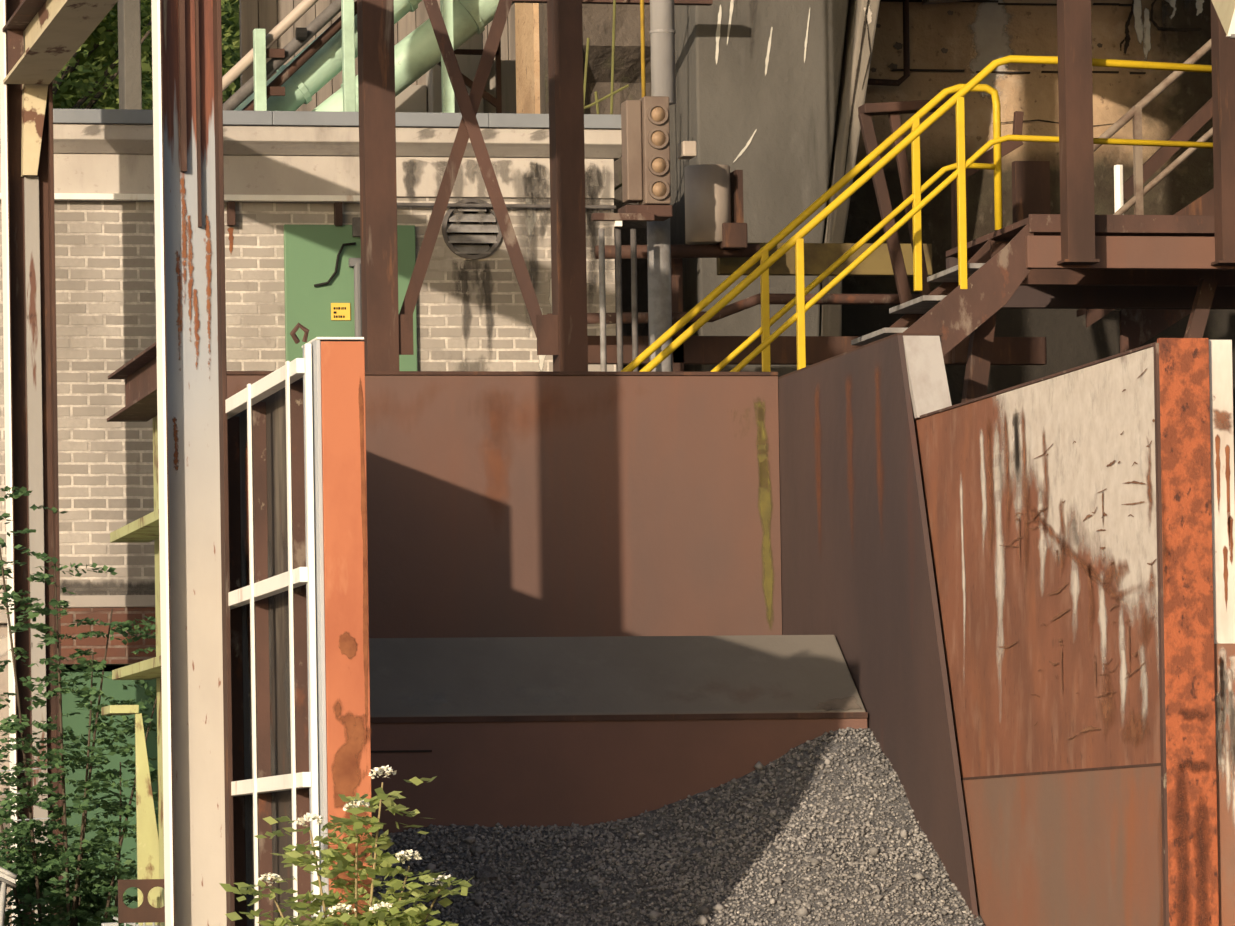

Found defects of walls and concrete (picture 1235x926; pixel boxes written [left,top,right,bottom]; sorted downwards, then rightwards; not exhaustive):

rust [175,178,211,379]
leakage [403,161,415,200]
leakage [459,264,494,342]
leakage [524,162,552,315]
leakage [585,165,602,299]
leakage [755,401,773,626]
peeling [980,347,1158,721]
rust [1214,410,1233,607]
rust [332,380,371,915]
rust [1181,711,1205,719]
peeling [1215,649,1235,824]
rust [1176,761,1208,926]